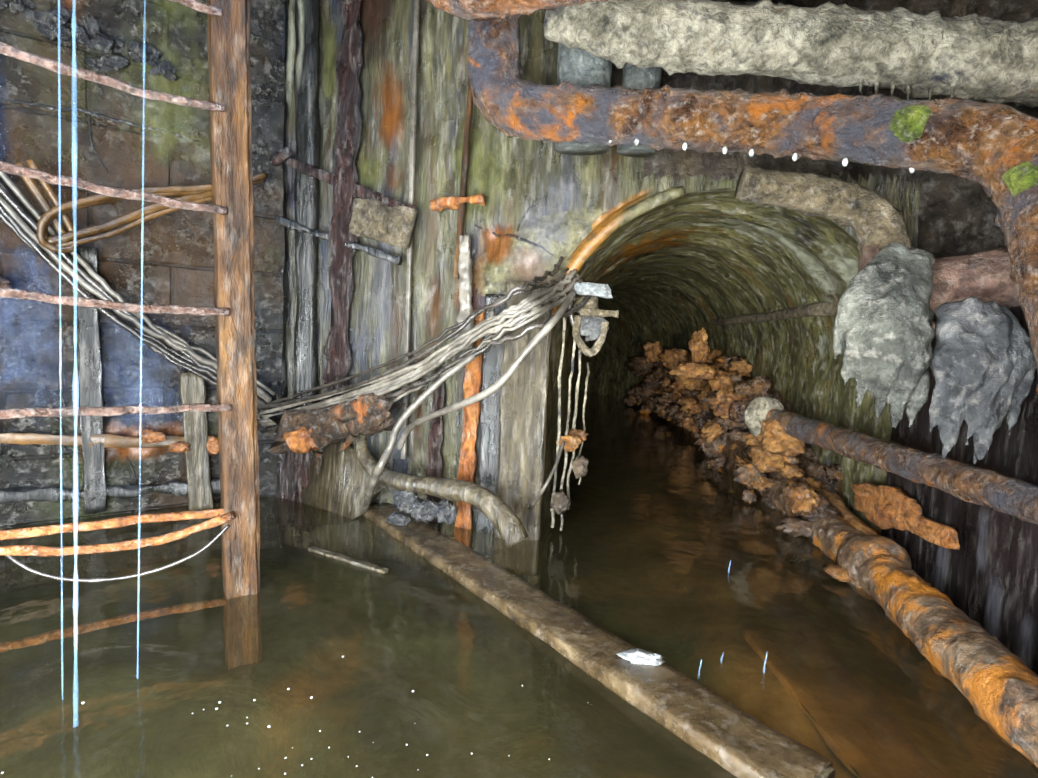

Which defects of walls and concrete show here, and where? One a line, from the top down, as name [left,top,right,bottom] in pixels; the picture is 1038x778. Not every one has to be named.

rust [556,192,645,292]
rust [428,289,439,336]
rust [417,369,445,478]
rust [457,338,483,483]
rust [454,501,473,548]
rust [851,482,960,550]
rust [823,564,856,583]